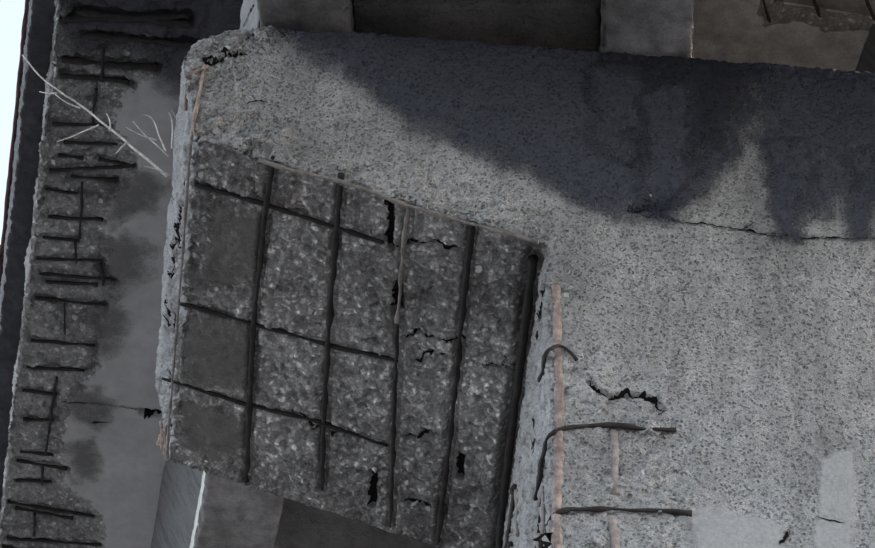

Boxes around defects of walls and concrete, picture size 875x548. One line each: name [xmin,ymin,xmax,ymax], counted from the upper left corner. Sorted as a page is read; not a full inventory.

spalling [50,0,292,455]
spalling [0,60,138,548]
spalling [161,108,784,548]
crack [589,378,665,411]
crack [61,401,137,423]
crack [406,429,432,439]
crack [405,498,447,506]